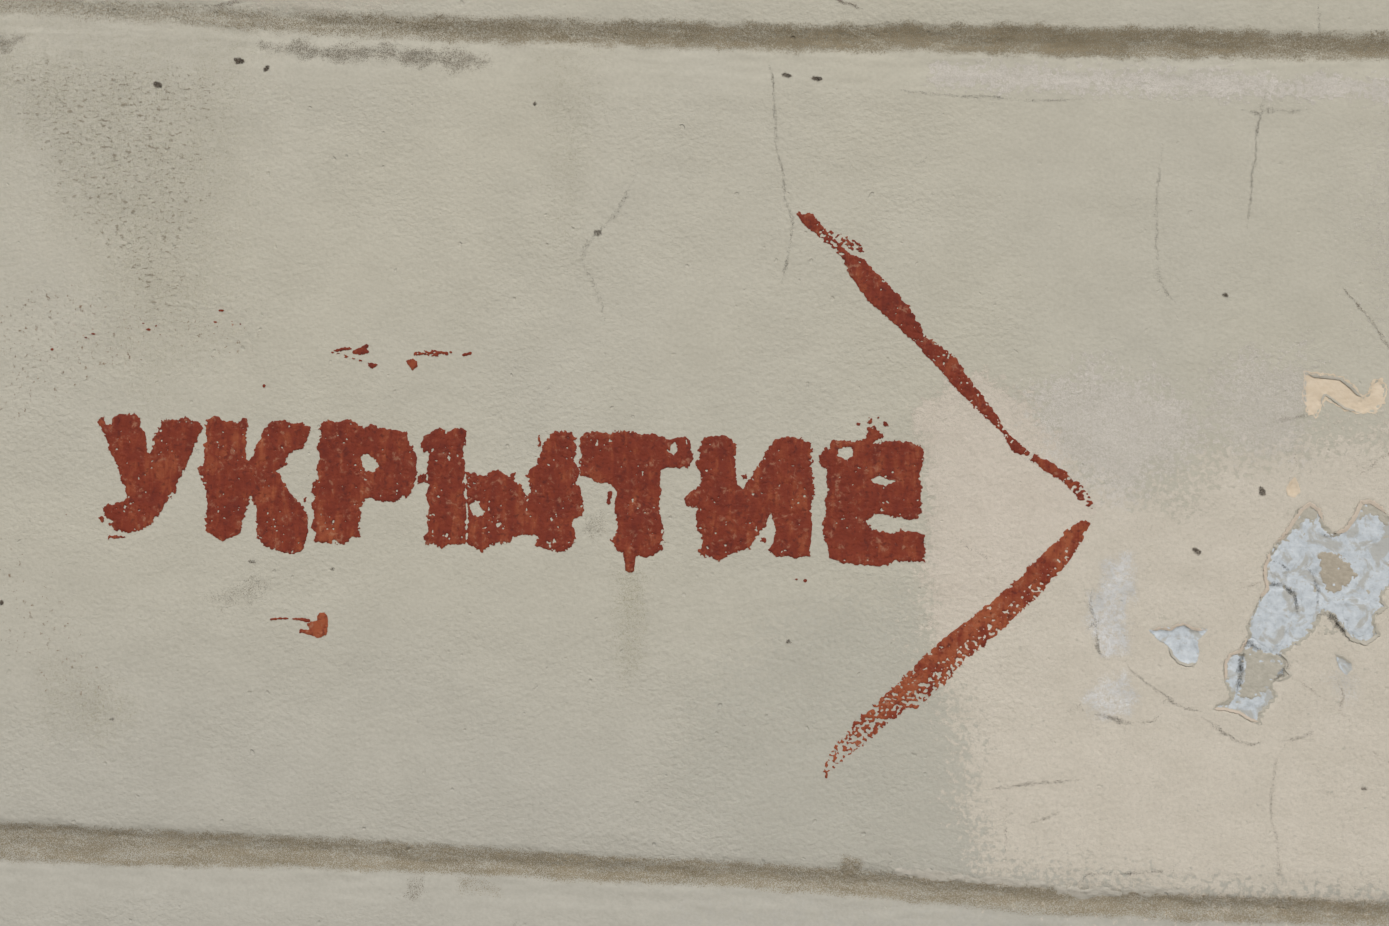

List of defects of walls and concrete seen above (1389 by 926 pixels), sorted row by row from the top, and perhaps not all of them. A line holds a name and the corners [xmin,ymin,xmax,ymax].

peeling [1302,371,1388,419]
peeling [1215,477,1389,725]
peeling [1149,623,1207,667]